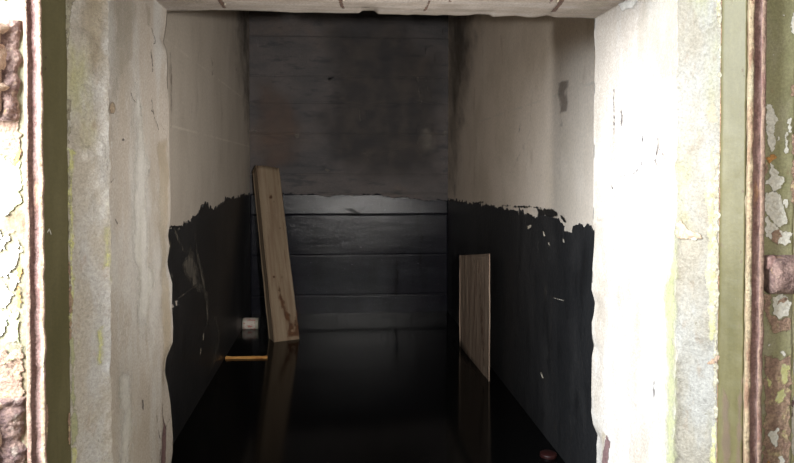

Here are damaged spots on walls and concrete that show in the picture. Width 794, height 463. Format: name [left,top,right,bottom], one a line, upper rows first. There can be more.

corrosion [0,106,22,166]
peeling [766,104,792,154]
peeling [764,163,794,246]
peeling [0,230,22,345]
corrosion [762,351,793,463]